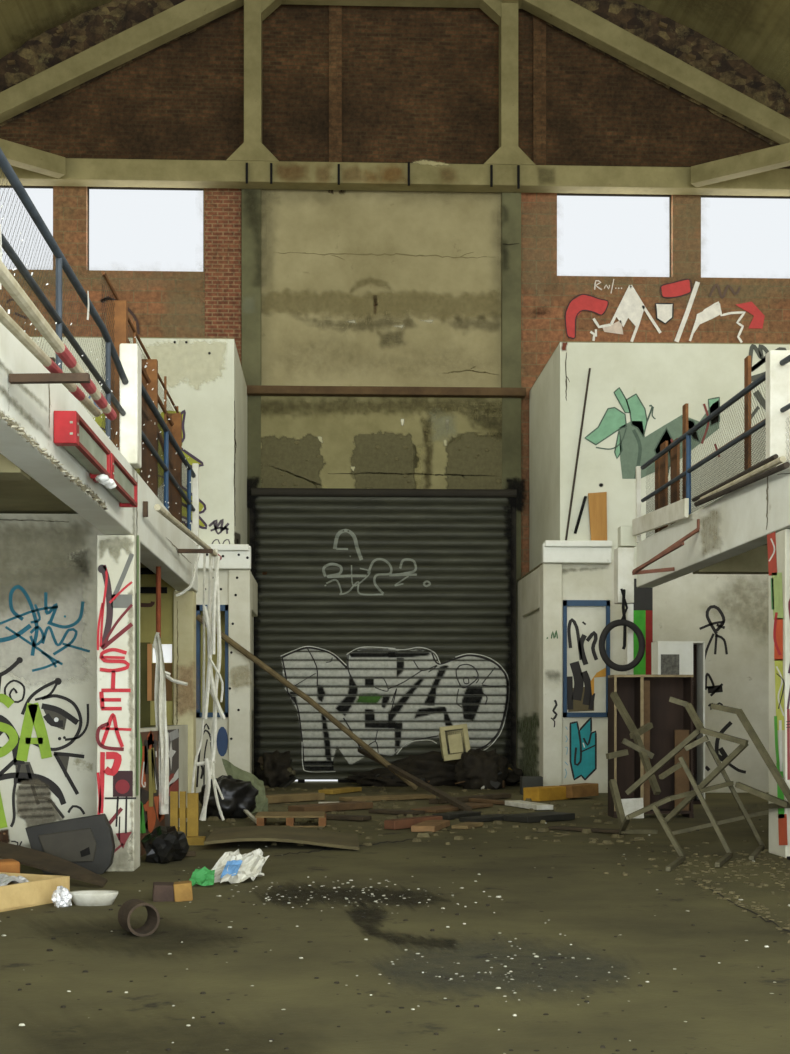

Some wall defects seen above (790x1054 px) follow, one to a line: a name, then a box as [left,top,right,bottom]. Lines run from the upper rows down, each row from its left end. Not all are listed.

crack [280,243,519,260]
peeling [145,342,226,389]
leakage [261,400,502,489]
crack [691,880,790,932]